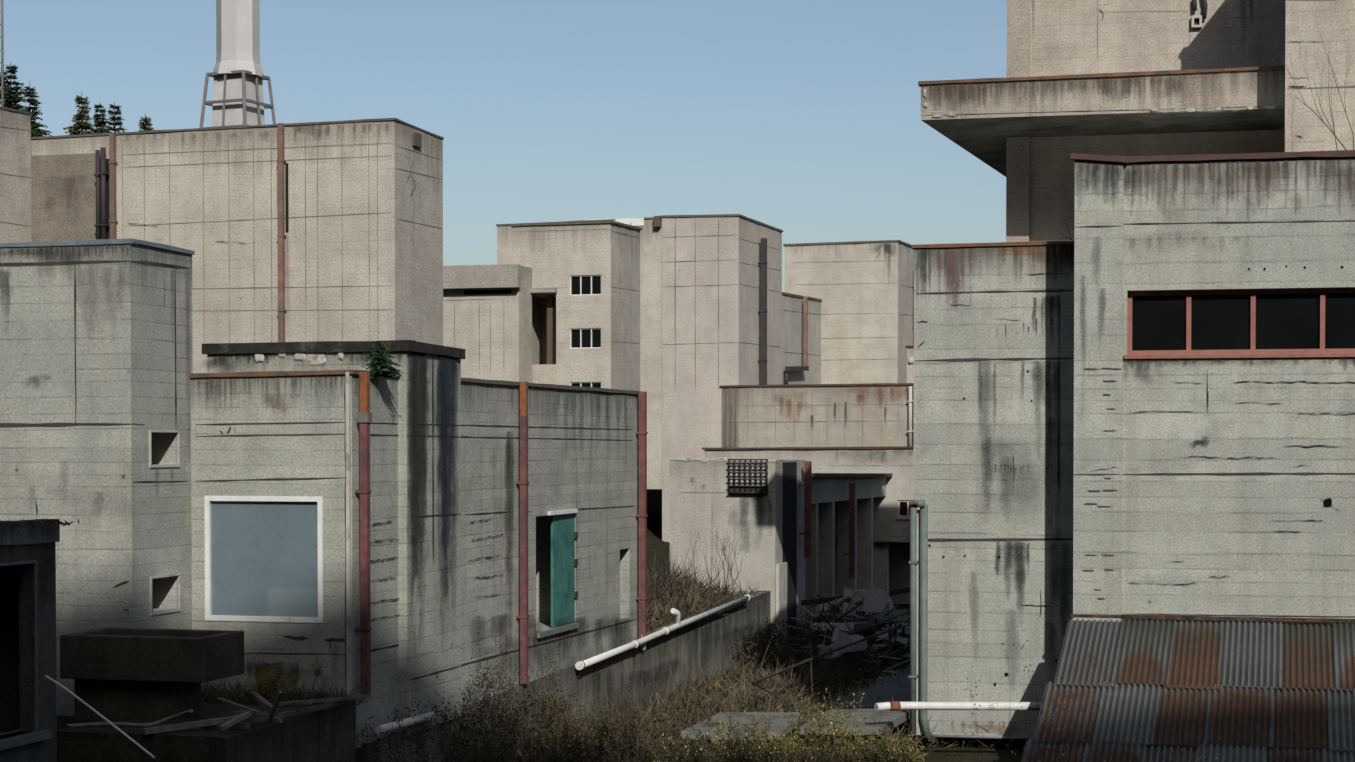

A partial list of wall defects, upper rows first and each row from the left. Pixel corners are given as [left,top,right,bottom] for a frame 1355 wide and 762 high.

leakage [399,351,457,587]
leakage [997,542,1029,597]